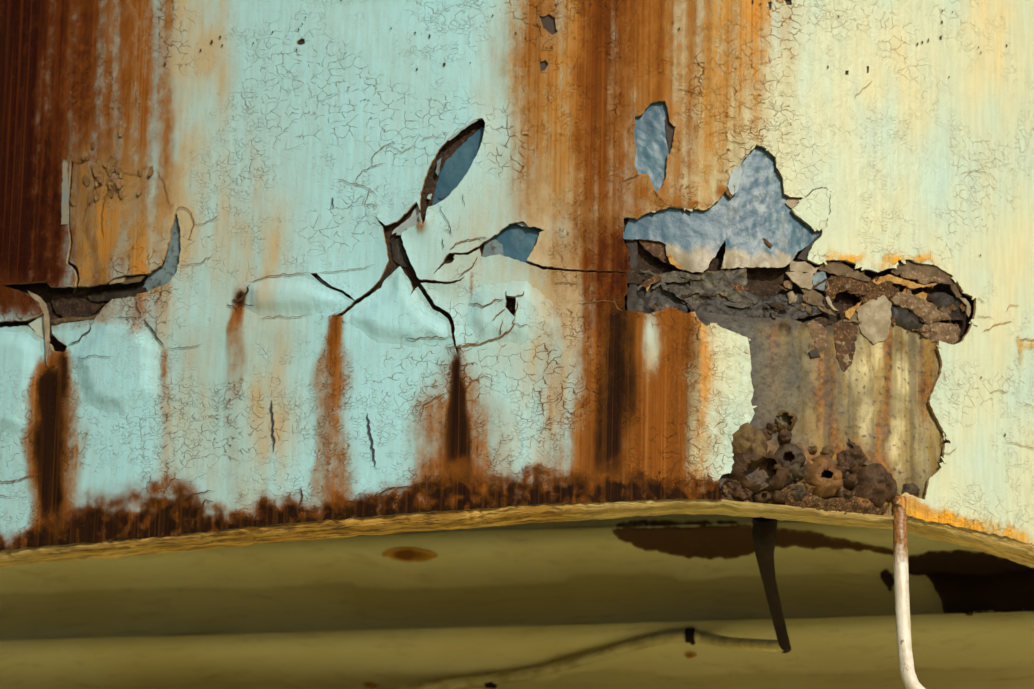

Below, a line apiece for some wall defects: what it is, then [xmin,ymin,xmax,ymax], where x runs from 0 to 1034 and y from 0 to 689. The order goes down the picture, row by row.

rust [0,0,176,321]
spalling [421,118,485,206]
peeling [634,101,675,192]
rust [21,345,87,528]
spalling [0,215,181,366]
rust [308,314,352,504]
crack [422,375,494,412]
rust [410,345,512,484]
crack [554,252,622,311]
rust [502,0,796,500]
spalling [429,146,978,515]
peeling [908,550,1034,616]